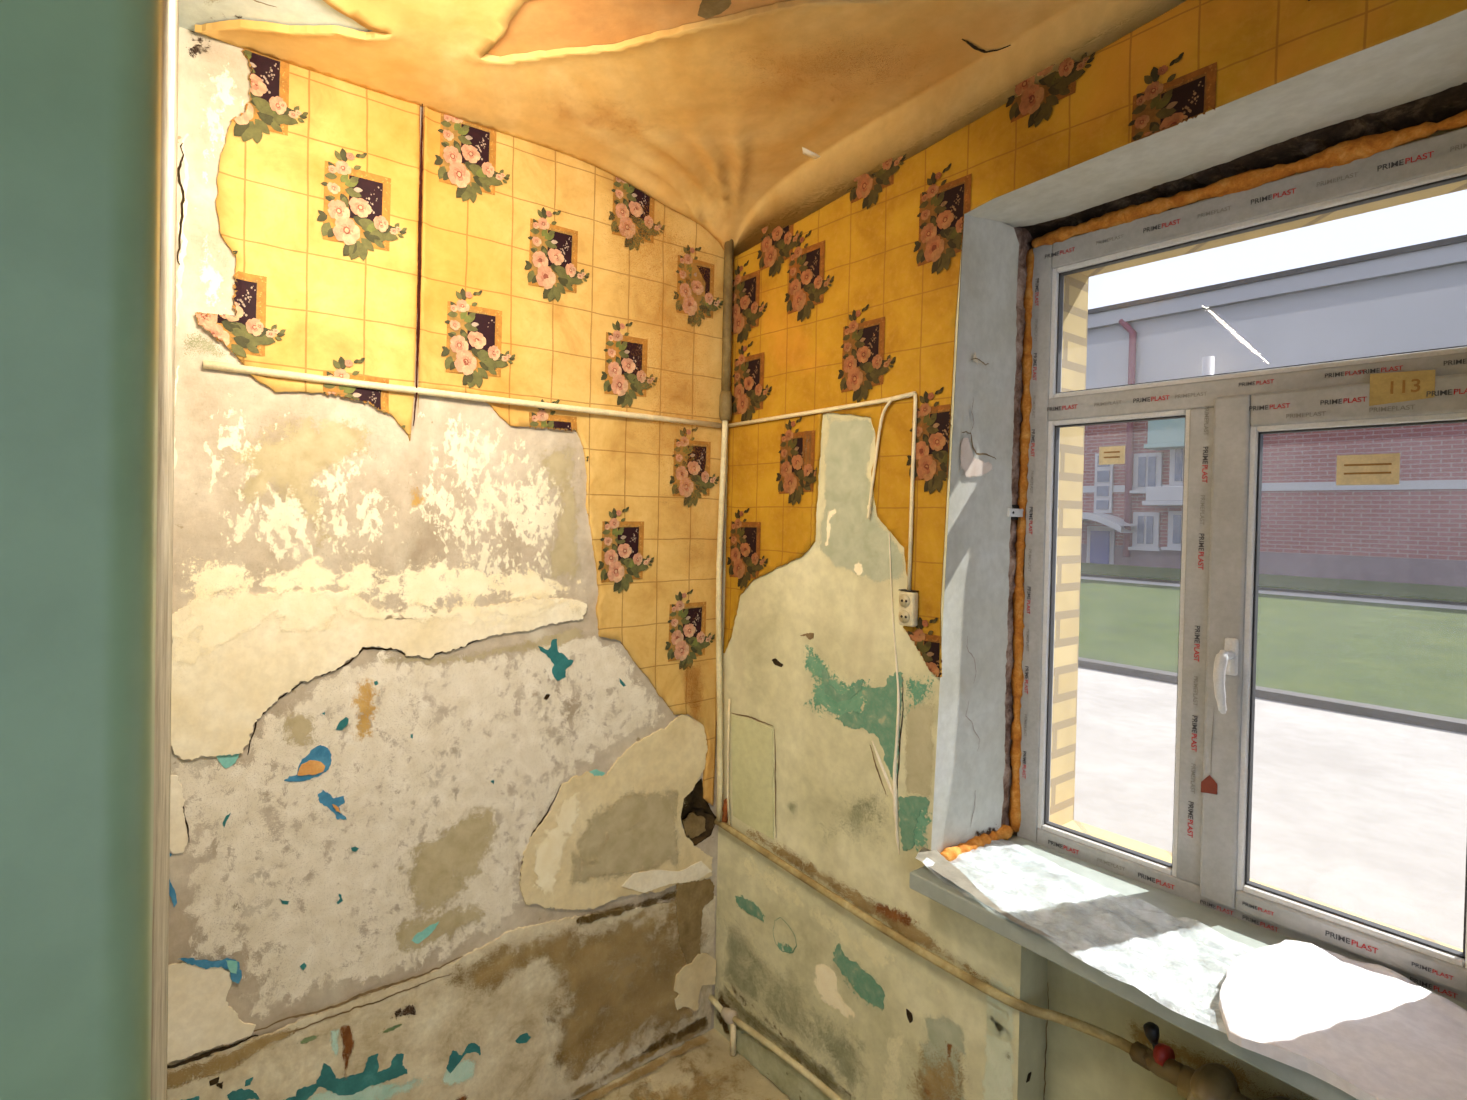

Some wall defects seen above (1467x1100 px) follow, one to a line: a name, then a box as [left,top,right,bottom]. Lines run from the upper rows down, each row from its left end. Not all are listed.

flaking render [800,416,935,855]
flaking render [167,392,870,1100]
damp [392,1005,416,1018]
damp [443,886,773,1100]
peeling [833,943,885,1011]